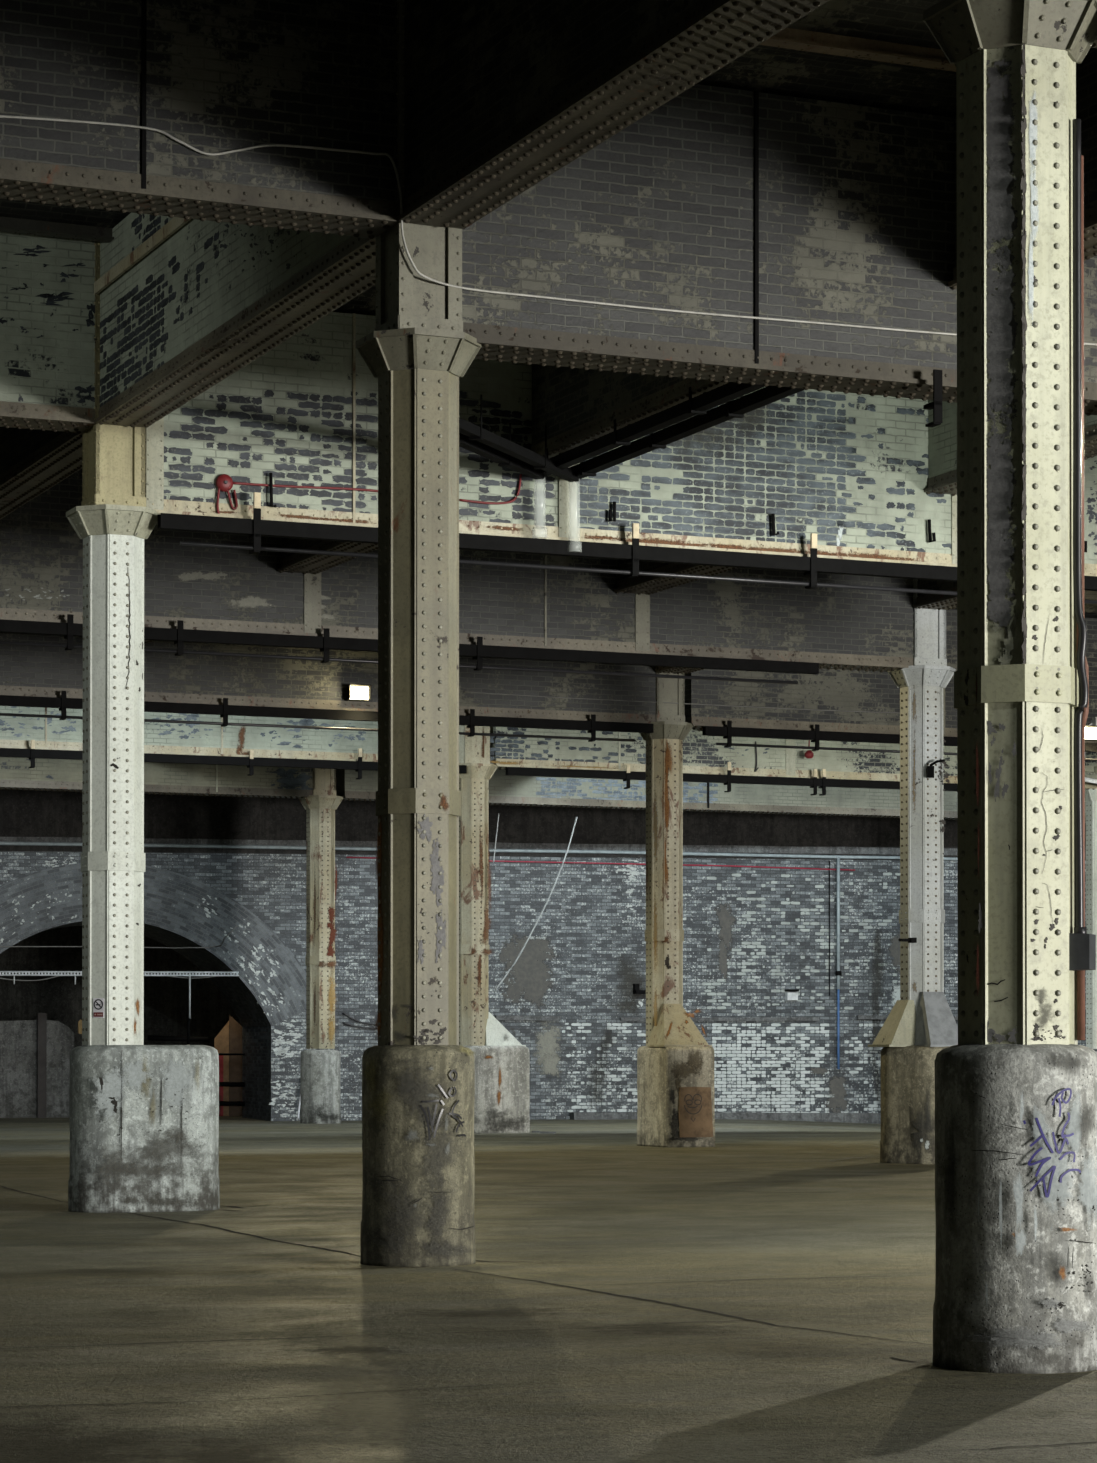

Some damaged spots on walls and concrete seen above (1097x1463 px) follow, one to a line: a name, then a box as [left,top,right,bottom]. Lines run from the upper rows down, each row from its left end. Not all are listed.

peeling [131,214,168,251]
peeling [982,44,1039,665]
peeling [1086,461,1097,555]
rust [653,740,673,969]
rust [313,863,338,1046]
water stain [95,1059,199,1123]
water stain [100,1129,190,1206]